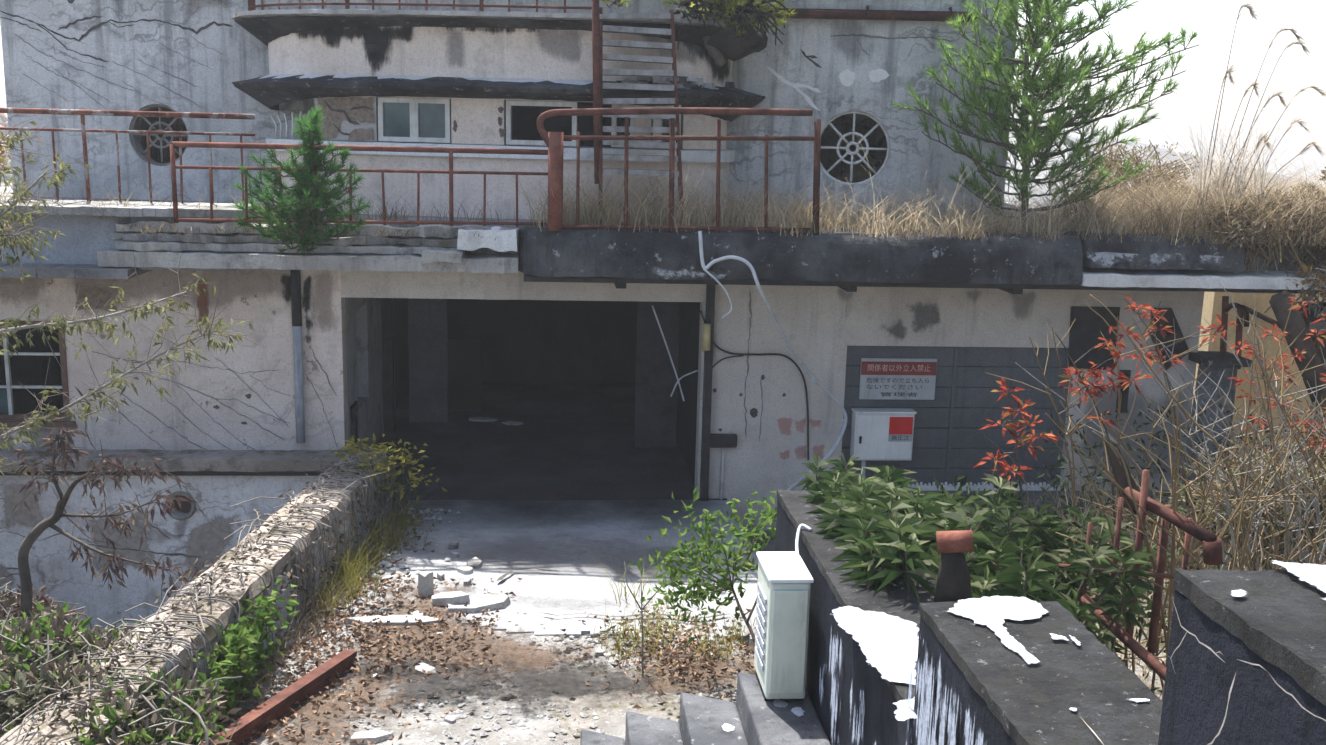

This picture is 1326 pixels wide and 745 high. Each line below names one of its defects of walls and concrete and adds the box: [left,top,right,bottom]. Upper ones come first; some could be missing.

crack [1,0,233,112]
water stain [322,27,341,47]
water stain [361,26,391,74]
peeling [4,482,43,527]
peeling [92,511,154,571]
peeling [184,515,235,579]
peeling [948,595,1048,664]
peeling [1049,633,1081,645]
peeling [819,606,983,745]
crack [1166,602,1326,745]